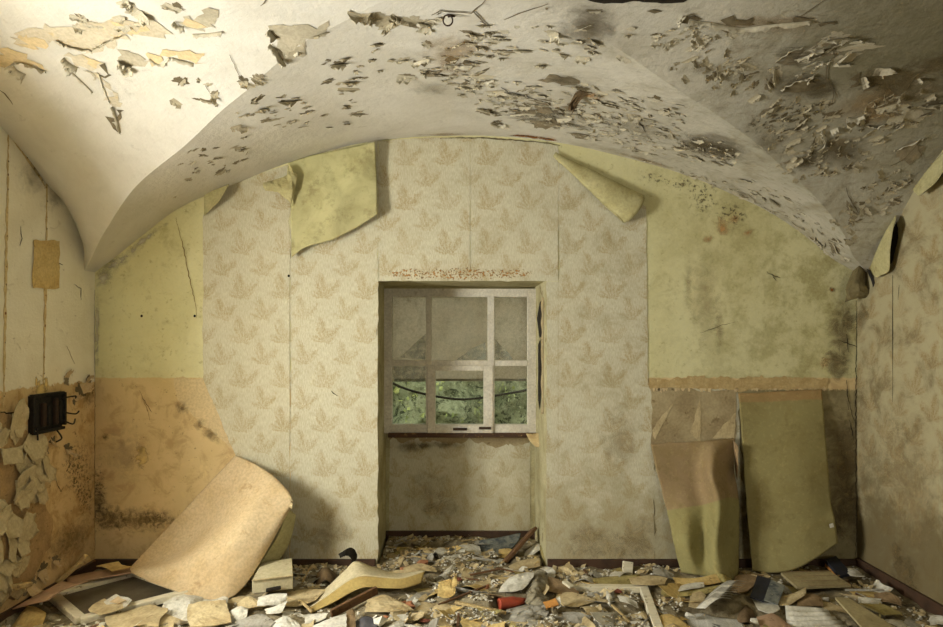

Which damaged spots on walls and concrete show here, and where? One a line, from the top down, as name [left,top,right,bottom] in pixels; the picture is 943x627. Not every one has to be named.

leakage [579,15,611,38]
peeling [0,0,222,135]
peeling [177,0,943,264]
leakage [693,138,733,154]
crack [176,221,197,317]
rust [392,268,528,280]
peeling [64,369,95,406]
peeling [0,398,81,607]
leakage [68,456,161,528]